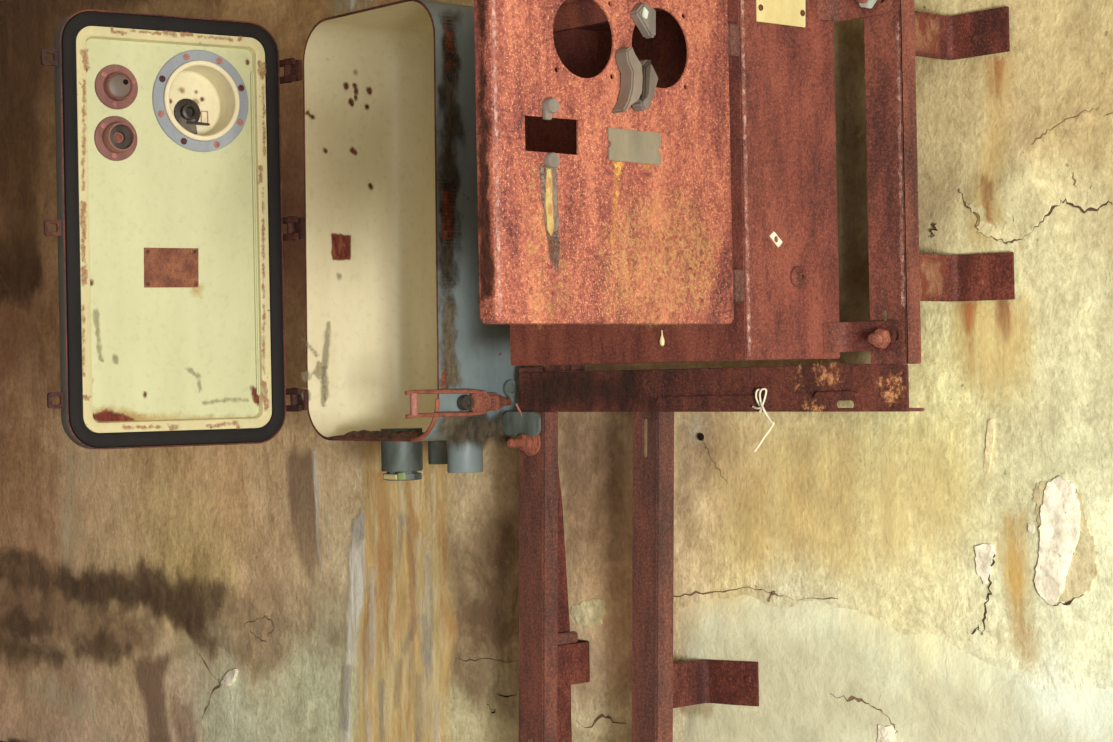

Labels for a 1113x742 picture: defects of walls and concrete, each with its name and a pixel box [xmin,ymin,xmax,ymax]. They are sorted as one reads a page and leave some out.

crack [1031,108,1113,145]
crack [958,173,1113,244]
rust [356,12,513,742]
water stain [0,550,230,664]
water stain [309,510,365,742]
crack [673,587,837,602]
peeling [975,544,996,600]
peeling [1028,476,1099,606]
water stain [138,659,168,742]
crack [831,694,898,733]